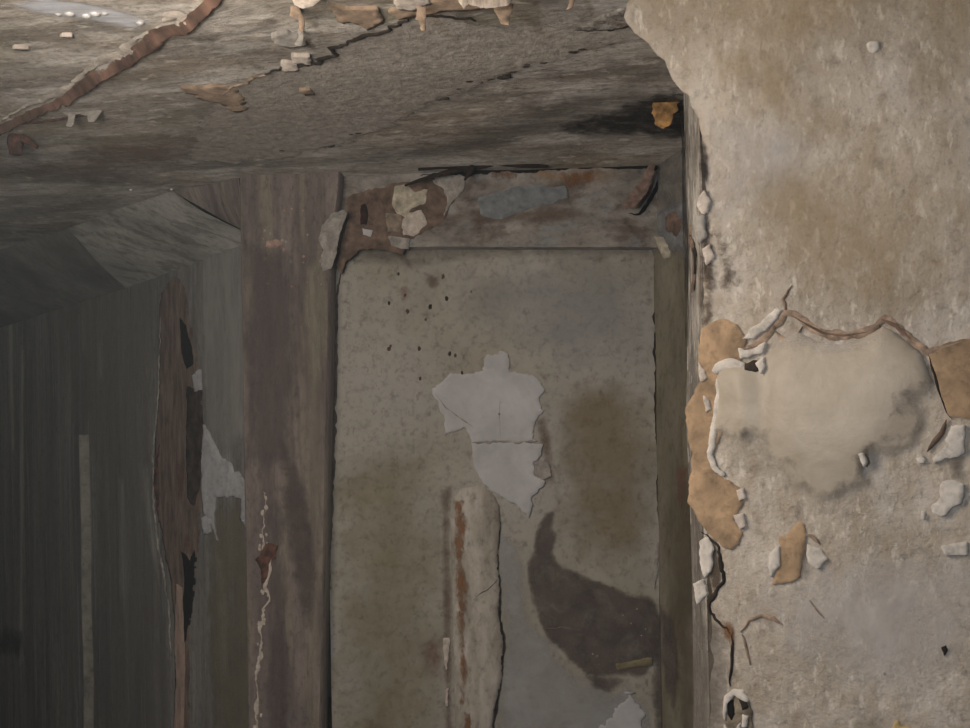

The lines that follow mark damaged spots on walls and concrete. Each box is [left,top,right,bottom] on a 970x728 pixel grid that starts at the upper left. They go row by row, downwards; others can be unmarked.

crack [0,0,221,136]
crack [222,15,476,95]
spalling [307,175,465,274]
crack [421,165,658,177]
spalling [154,276,246,728]
peeling [432,351,551,517]
spalling [685,319,747,550]
spalling [917,339,970,520]
crack [253,584,271,728]
rust [455,502,467,681]
damp [501,512,677,728]
crack [693,532,783,686]